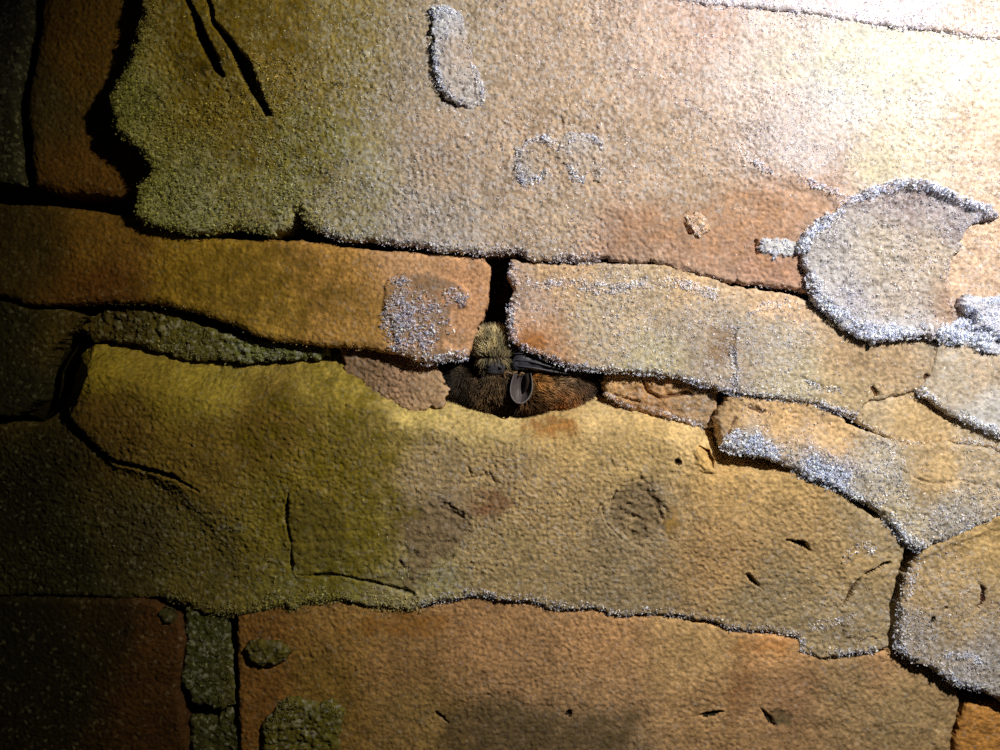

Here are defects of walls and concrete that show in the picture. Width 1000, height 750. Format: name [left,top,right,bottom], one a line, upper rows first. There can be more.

crack [187,0,272,117]
crack [5,300,269,341]
crack [28,342,192,488]